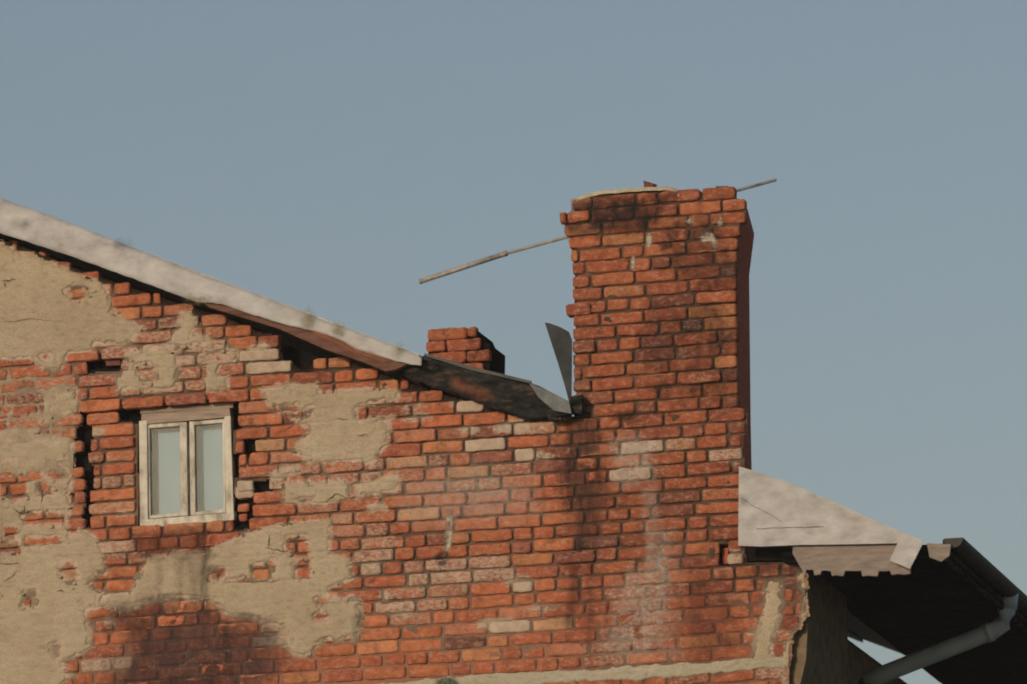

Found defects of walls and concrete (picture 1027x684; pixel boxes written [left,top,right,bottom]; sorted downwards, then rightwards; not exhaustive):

peeling [0,239,270,439]
crack [114,404,129,417]
crack [73,411,97,528]
peeling [0,383,401,684]
leakage [124,610,274,684]
peeling [753,572,810,684]